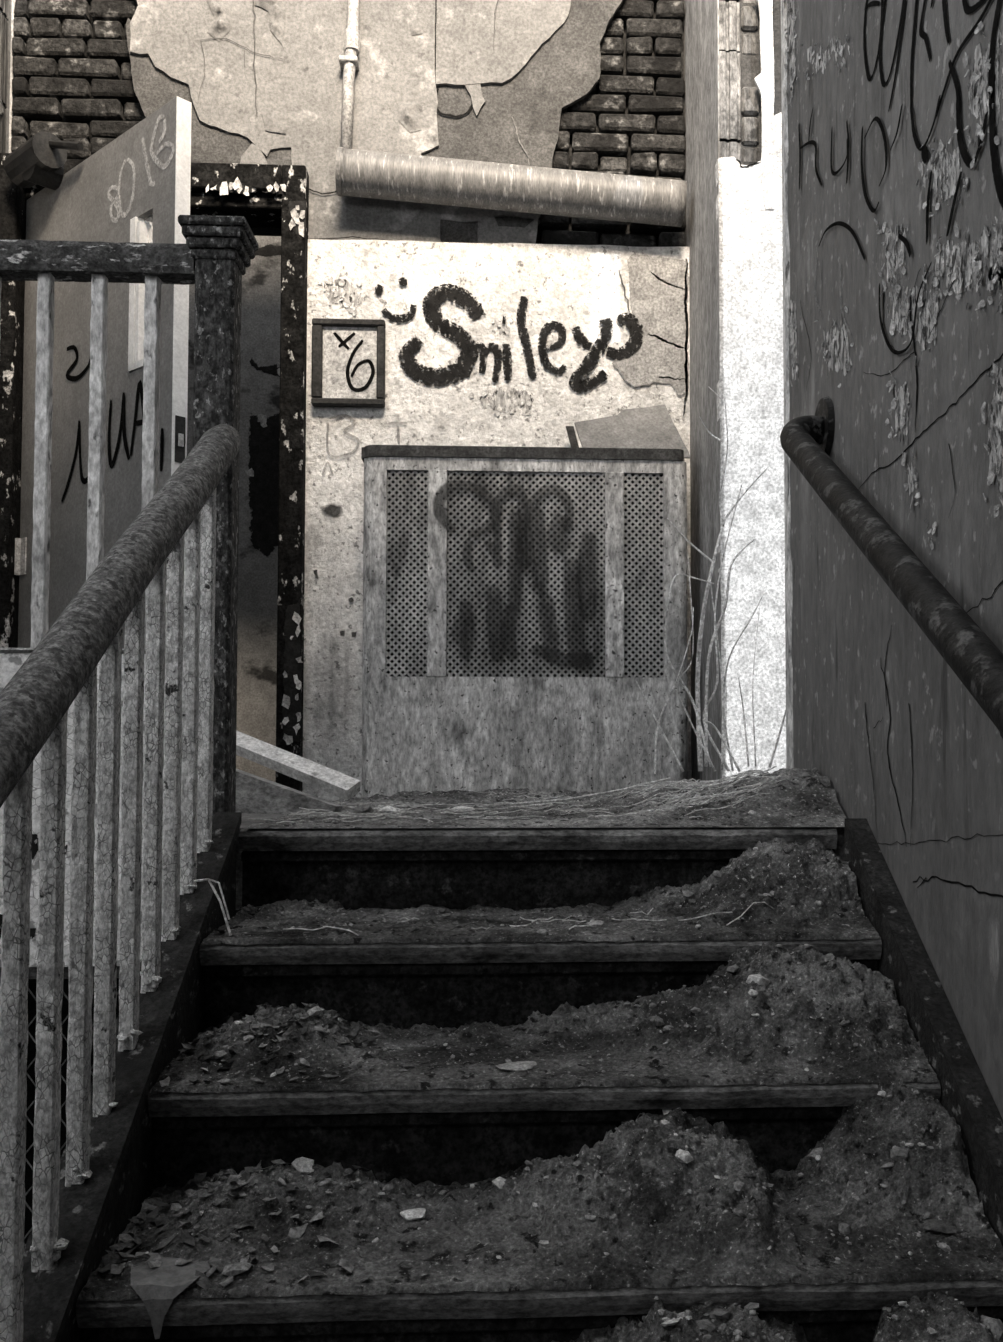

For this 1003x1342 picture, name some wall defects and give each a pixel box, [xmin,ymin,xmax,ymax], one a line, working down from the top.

spalling [11,0,306,240]
spalling [421,0,686,180]
peeling [916,21,1003,217]
peeling [255,244,281,257]
spalling [440,220,478,243]
flaking render [492,213,689,396]
peeling [885,370,920,509]
crack [859,268,1003,515]
peeling [874,216,1003,366]
peeling [981,362,1003,518]
crack [967,580,1003,613]
crack [865,625,1003,898]